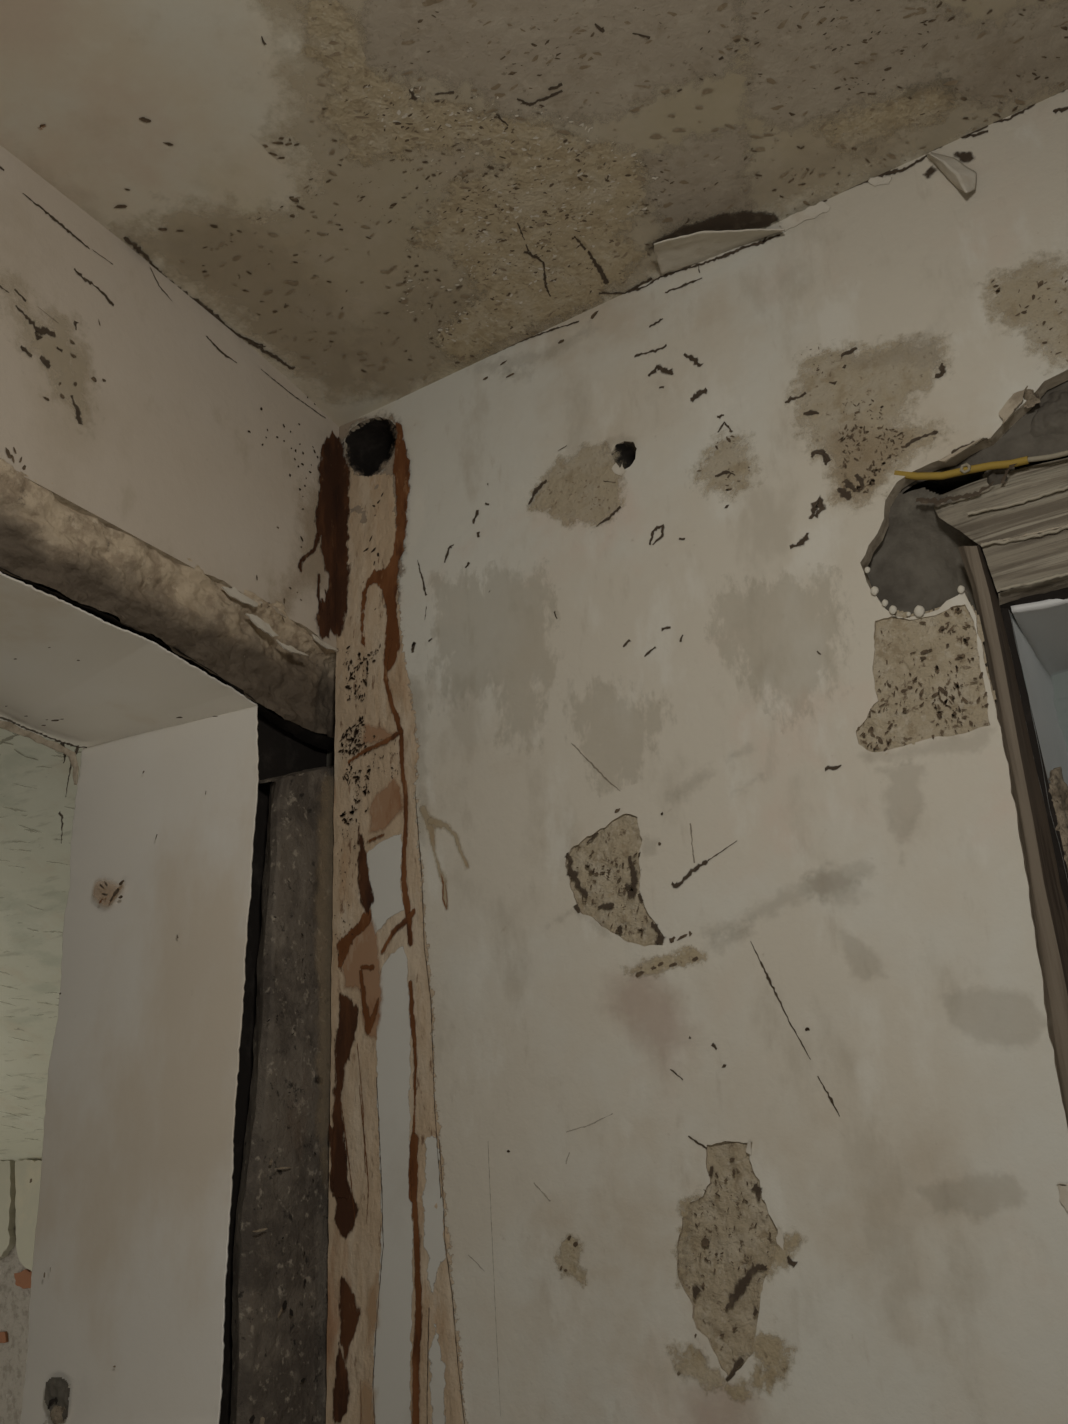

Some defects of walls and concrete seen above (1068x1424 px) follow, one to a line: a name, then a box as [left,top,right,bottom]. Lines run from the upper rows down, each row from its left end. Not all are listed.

spalling [263,137,300,159]
peeling [924,125,988,193]
spalling [785,392,819,415]
spalling [837,473,864,500]
flaking render [939,438,988,463]
flaking render [998,385,1040,425]
spalling [857,487,996,754]
rust [298,422,415,1240]
spalling [565,808,706,978]
rust [408,980,423,1424]
spalling [670,1136,802,1401]
rust [332,1276,376,1424]